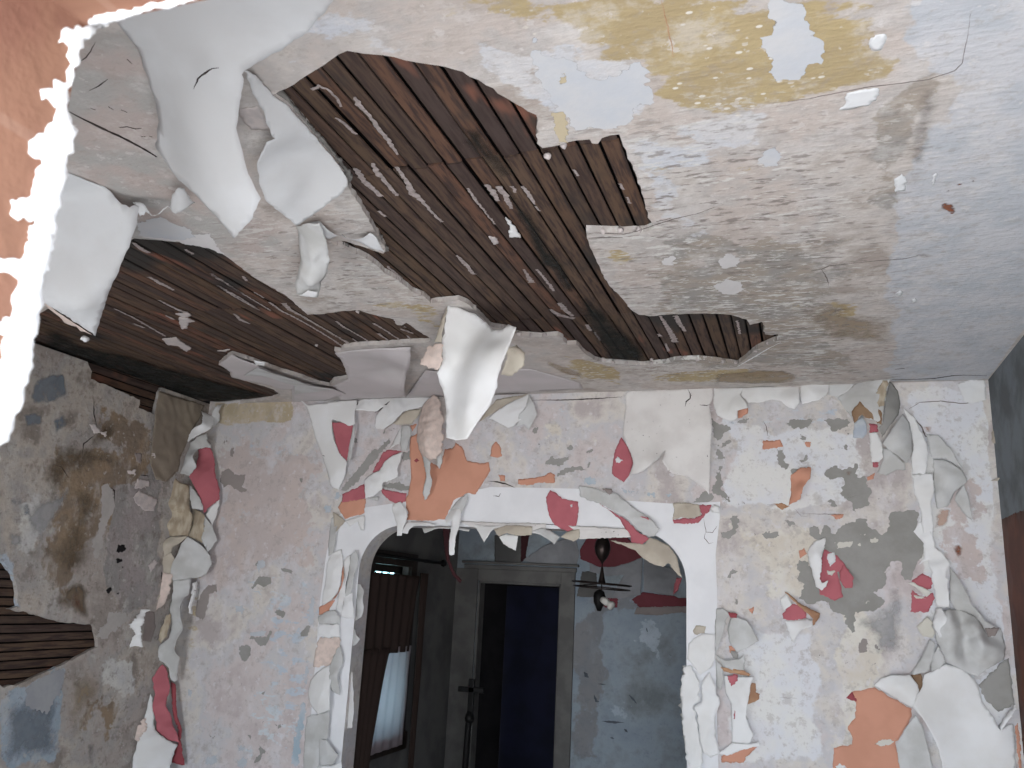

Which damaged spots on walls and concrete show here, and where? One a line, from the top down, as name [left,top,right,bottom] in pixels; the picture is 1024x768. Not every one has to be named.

spalling [760,0,825,81]
crack [795,14,971,101]
crack [68,79,157,157]
spalling [0,0,429,445]
spalling [276,38,778,366]
water stain [47,429,112,482]
spalling [692,418,749,539]
spalling [787,418,850,450]
water stain [60,585,86,614]
water stain [61,483,115,568]
spalling [797,463,924,653]
spalling [0,563,95,752]